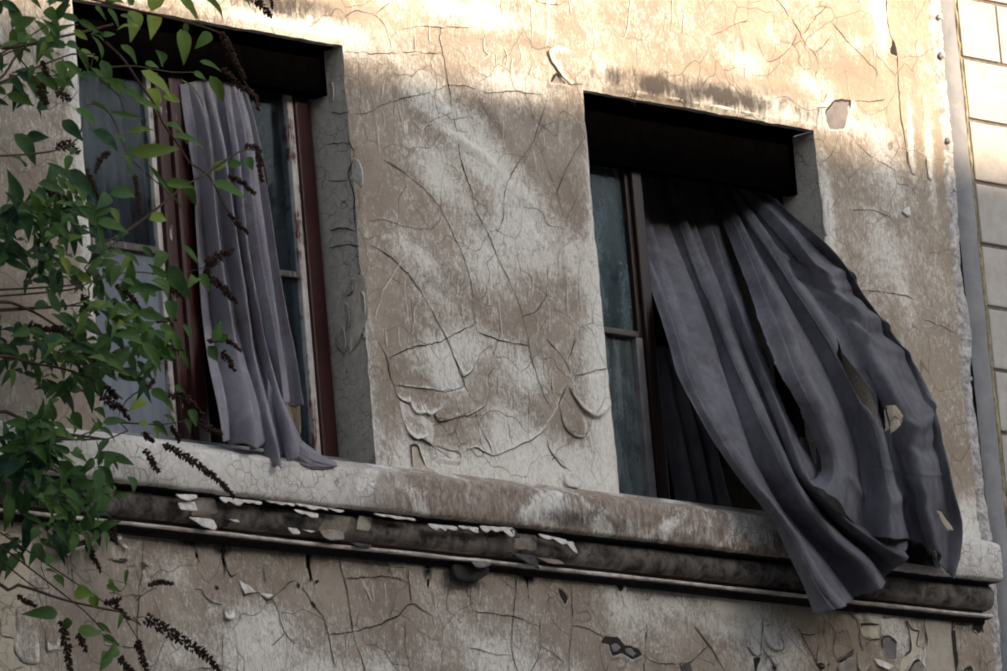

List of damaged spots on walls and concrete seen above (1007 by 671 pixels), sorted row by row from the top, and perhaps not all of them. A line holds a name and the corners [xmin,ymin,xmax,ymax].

water stain [634,74,784,114]
crack [712,0,908,172]
spalling [813,92,856,133]
crack [326,0,607,469]
spalling [928,0,993,542]
spalling [175,494,415,541]
peeling [427,524,577,569]
spalling [0,526,63,671]
crack [182,545,610,671]
crack [641,624,726,671]
crack [746,611,895,671]
spalling [817,612,976,671]